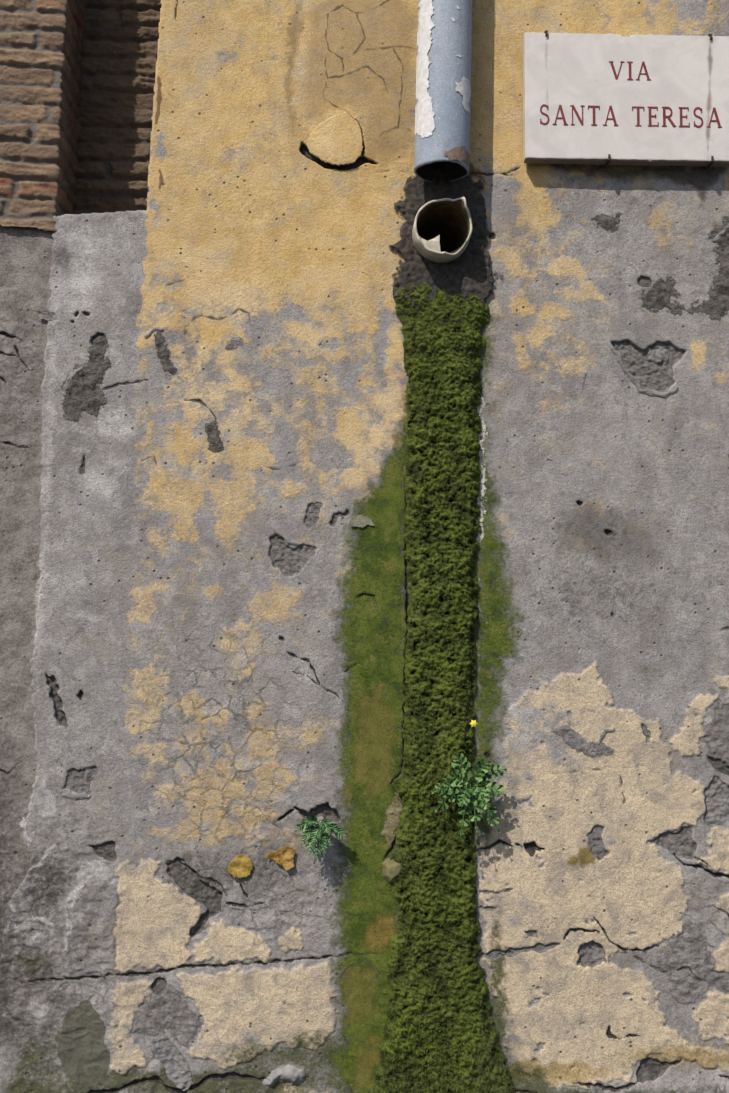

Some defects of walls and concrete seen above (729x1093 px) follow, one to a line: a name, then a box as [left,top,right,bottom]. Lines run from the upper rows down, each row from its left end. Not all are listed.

crack [299,112,390,171]
flaking render [638,216,729,321]
flaking render [58,332,148,422]
flaking render [611,340,685,397]
damp [476,375,489,543]
damp [344,689,395,805]
flaking render [166,857,265,937]
crack [479,888,513,910]
crack [673,853,729,878]
crack [20,953,384,984]
crack [478,943,560,960]
flaking render [563,919,729,1004]